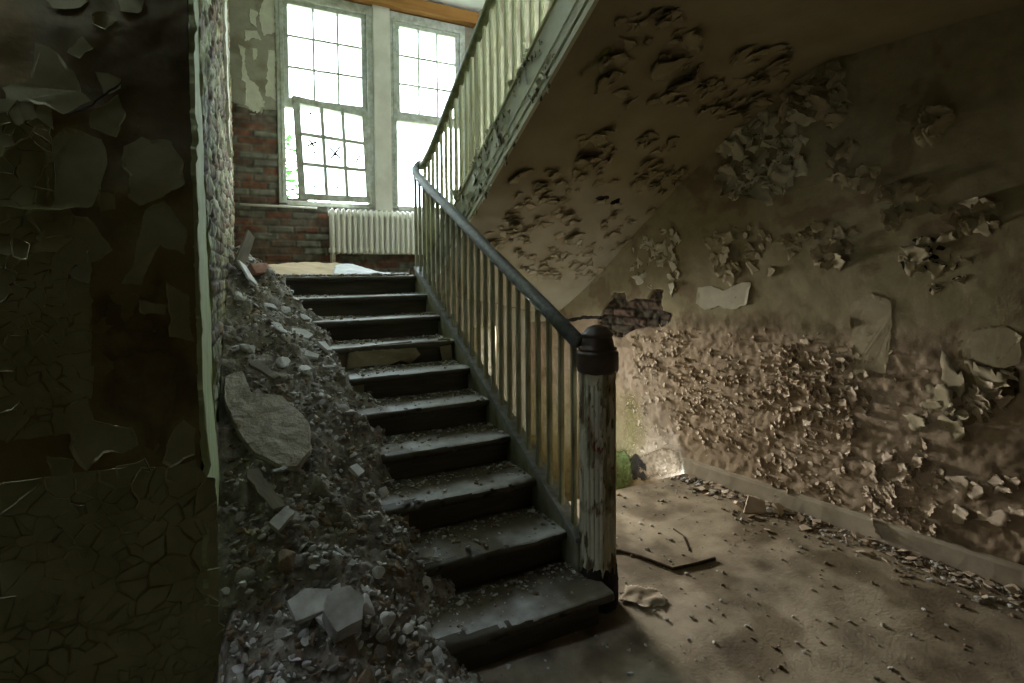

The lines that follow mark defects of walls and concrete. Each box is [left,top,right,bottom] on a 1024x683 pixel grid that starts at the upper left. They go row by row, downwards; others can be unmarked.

flaking render [0,0,423,606]
peeling [451,39,1024,539]